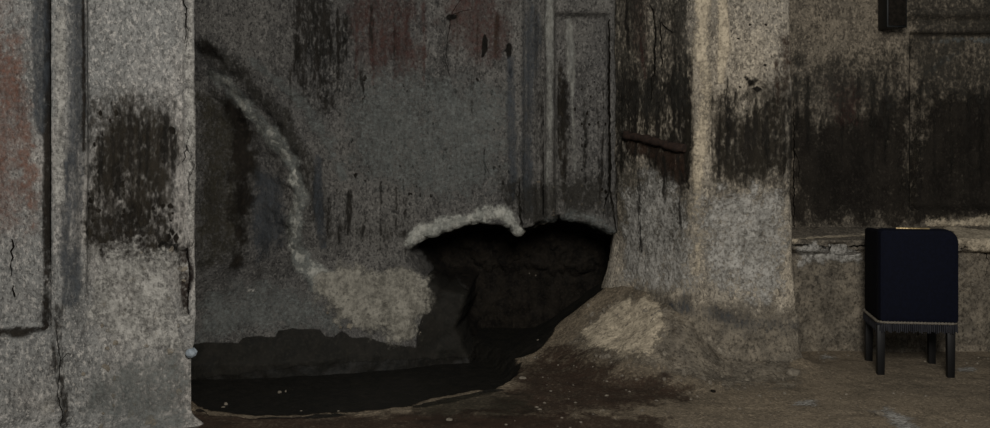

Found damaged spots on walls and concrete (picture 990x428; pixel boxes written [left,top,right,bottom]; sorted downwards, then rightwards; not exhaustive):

crack [9,239,17,297]
damp [0,0,366,428]
spalling [404,169,990,359]
damp [508,0,931,252]
damp [925,215,990,226]